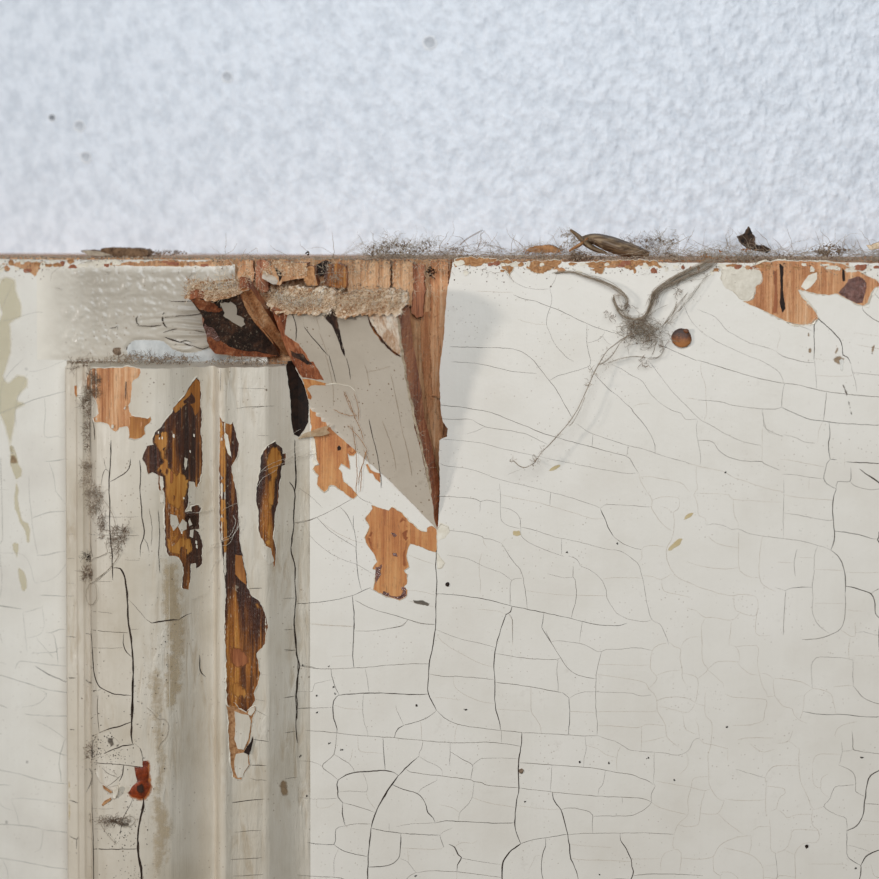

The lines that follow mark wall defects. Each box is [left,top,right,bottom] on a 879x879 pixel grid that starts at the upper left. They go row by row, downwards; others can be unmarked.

peeling [454,256,879,326]
crack [0,420,191,879]
peeling [74,339,251,590]
peeling [218,415,269,781]
peeling [255,440,286,567]
peeling [308,406,358,500]
peeling [365,463,381,483]
peeling [364,504,450,601]
crack [253,275,879,879]